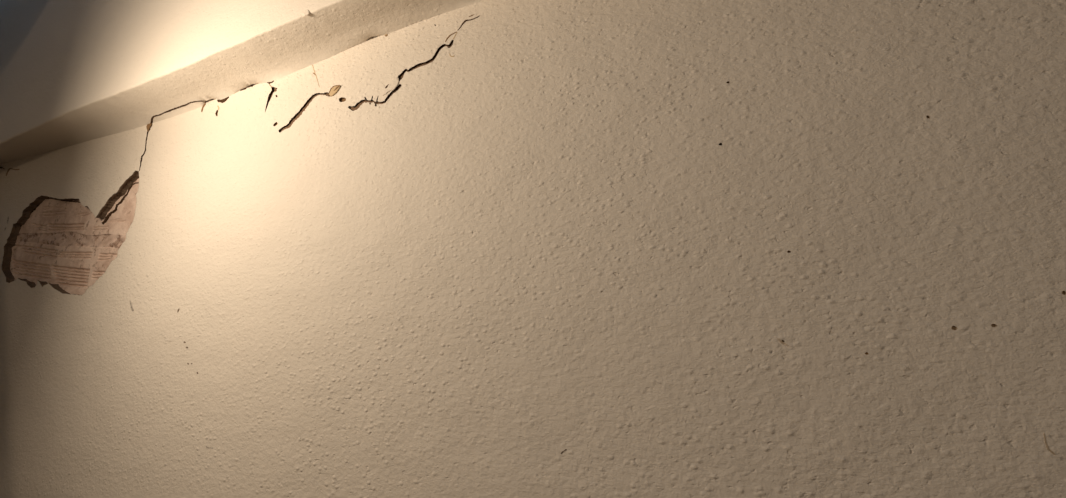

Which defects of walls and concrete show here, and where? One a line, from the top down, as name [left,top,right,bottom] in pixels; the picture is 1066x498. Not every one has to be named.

crack [139,15,480,171]
flaking render [2,170,139,296]